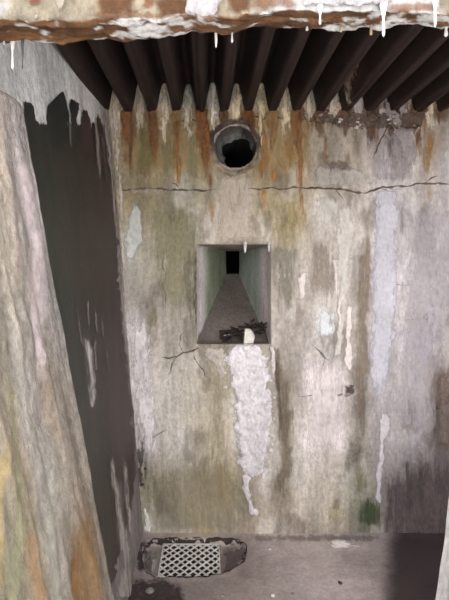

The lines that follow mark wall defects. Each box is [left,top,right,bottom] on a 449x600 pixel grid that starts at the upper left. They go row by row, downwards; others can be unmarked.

water stain [185,0,221,16]
corrosion [121,110,135,163]
corrosion [195,109,212,185]
corrosion [241,110,279,172]
crack [122,176,449,203]
corrosion [286,104,387,190]
spalling [304,109,426,134]
peeling [24,92,146,586]
crack [161,246,206,377]
water stain [274,190,403,449]
water stain [205,345,292,516]
water stain [375,412,449,600]